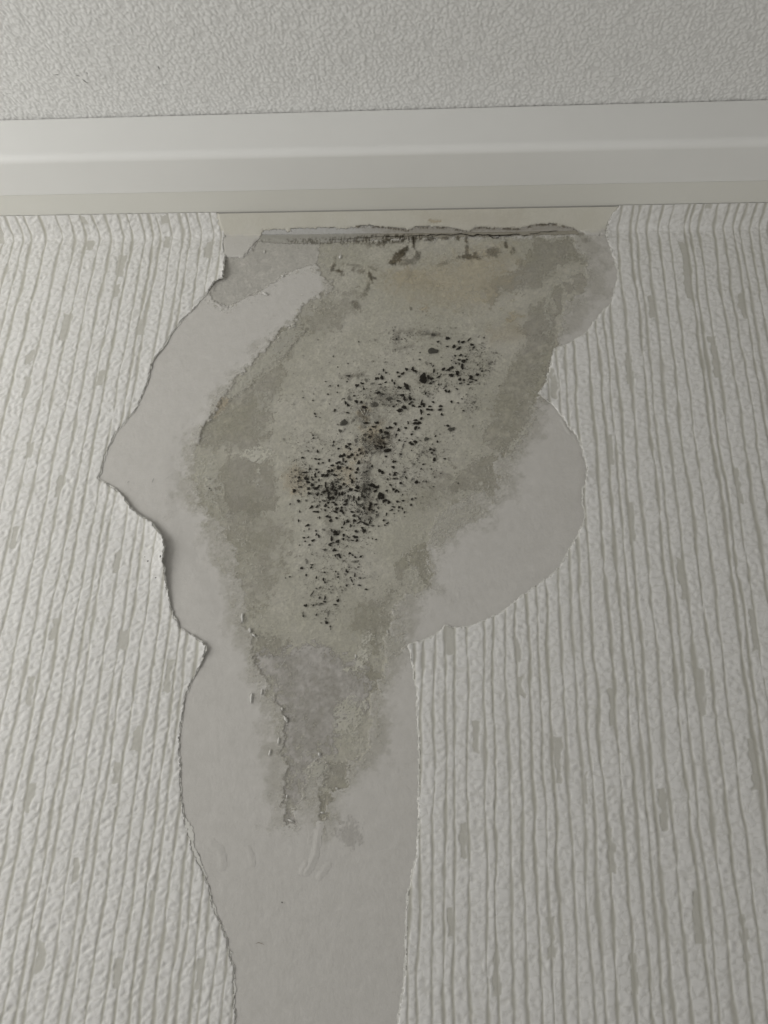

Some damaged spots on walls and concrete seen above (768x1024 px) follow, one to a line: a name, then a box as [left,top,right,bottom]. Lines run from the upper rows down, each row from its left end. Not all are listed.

peeling [99,225,617,1024]
leakage [187,224,590,825]